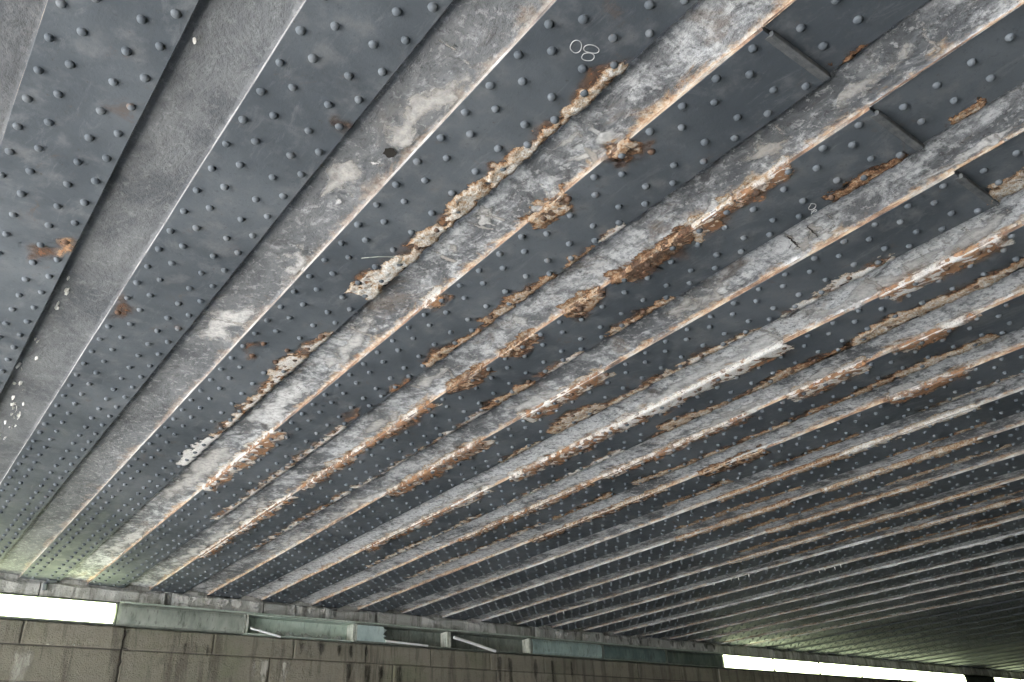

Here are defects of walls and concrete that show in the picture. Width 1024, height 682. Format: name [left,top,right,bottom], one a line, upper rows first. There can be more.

corrosion [30,238,75,259]
corrosion [346,61,629,300]
corrosion [602,132,652,168]
corrosion [556,155,793,321]
corrosion [821,152,909,203]
corrosion [948,97,987,125]
corrosion [196,351,584,558]
corrosion [363,222,1024,578]